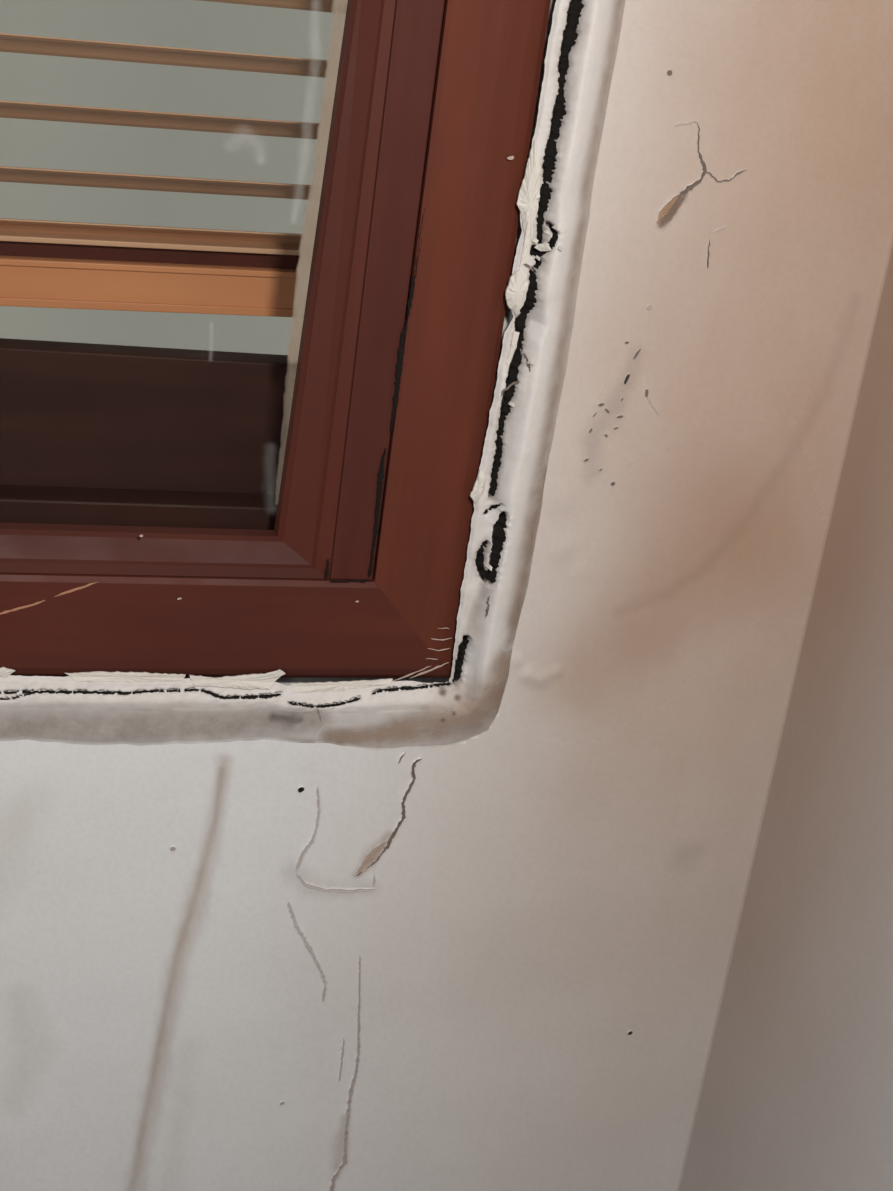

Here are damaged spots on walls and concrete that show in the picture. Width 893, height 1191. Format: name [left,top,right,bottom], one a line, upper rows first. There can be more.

crack [656,121,747,226]
peeling [505,140,552,314]
peeling [506,331,520,366]
peeling [470,469,486,503]
peeling [0,667,15,677]
peeling [65,669,393,692]
crack [287,752,422,1002]
crack [329,955,361,1191]